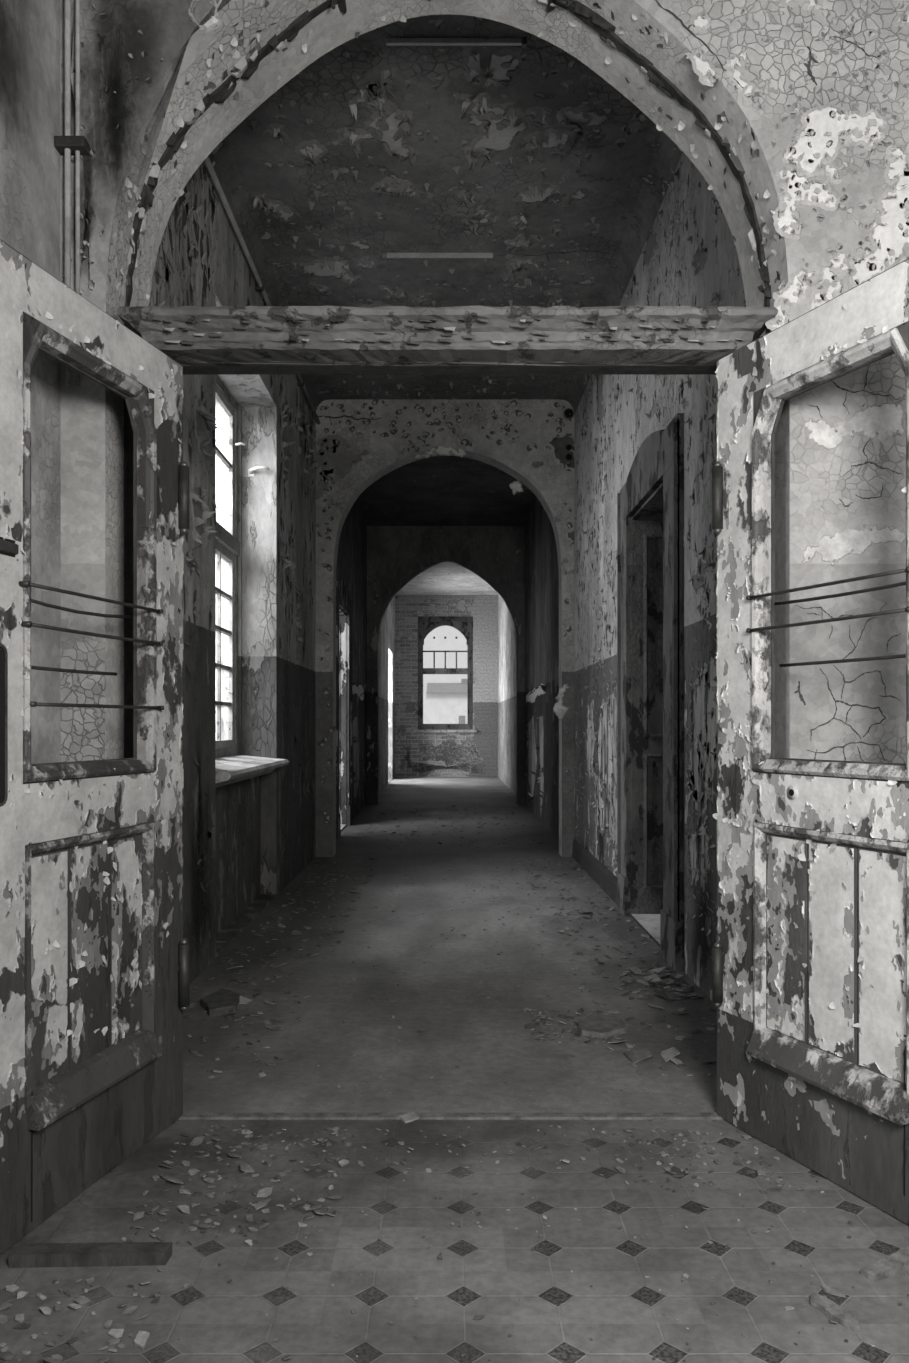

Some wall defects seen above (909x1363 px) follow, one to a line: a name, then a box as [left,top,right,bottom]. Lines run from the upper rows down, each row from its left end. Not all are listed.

leakage [74,10,149,249]
peeling [113,0,276,254]
crack [655,0,744,88]
peeling [679,11,759,190]
crack [803,35,880,85]
peeling [748,103,909,331]
crack [807,366,899,418]
peeling [804,402,905,450]
crack [839,438,903,507]
crack [794,603,901,762]
peeling [686,655,759,888]
peeling [97,833,119,901]